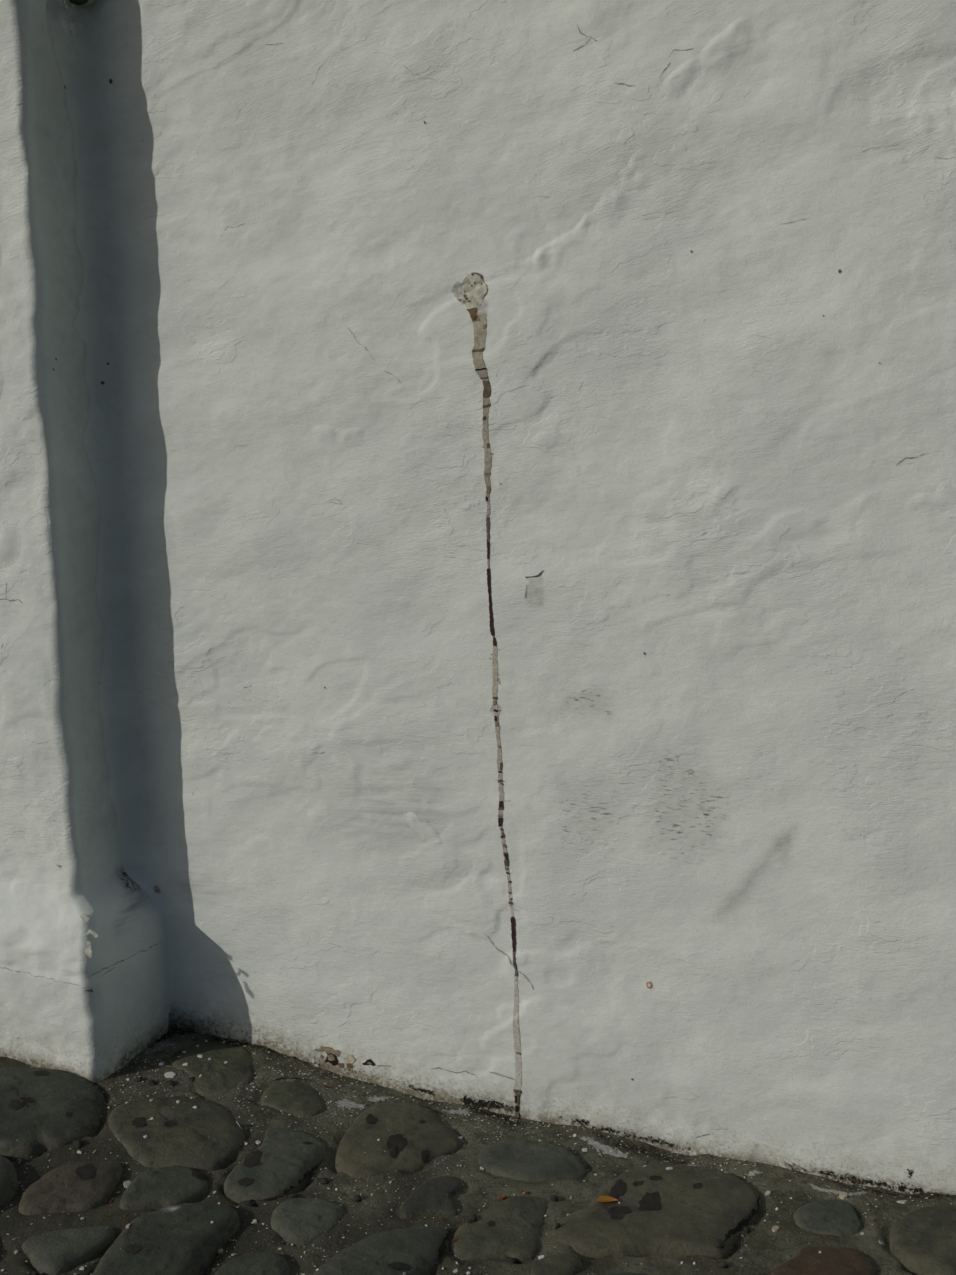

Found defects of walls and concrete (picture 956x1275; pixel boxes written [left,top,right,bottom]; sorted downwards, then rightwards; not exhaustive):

crack [430,308,533,1118]